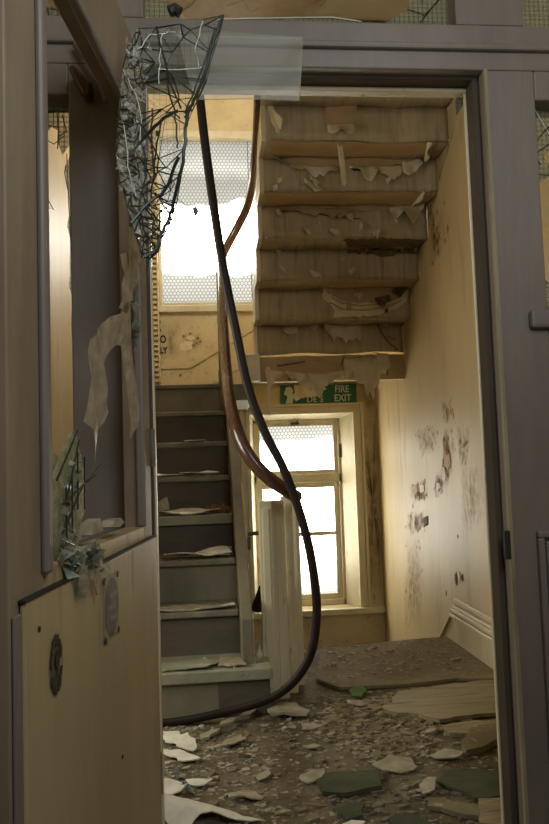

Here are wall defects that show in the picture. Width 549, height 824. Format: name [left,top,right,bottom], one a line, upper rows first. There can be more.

peeling [182,0,310,21]
peeling [265,105,432,343]
peeling [265,353,390,399]